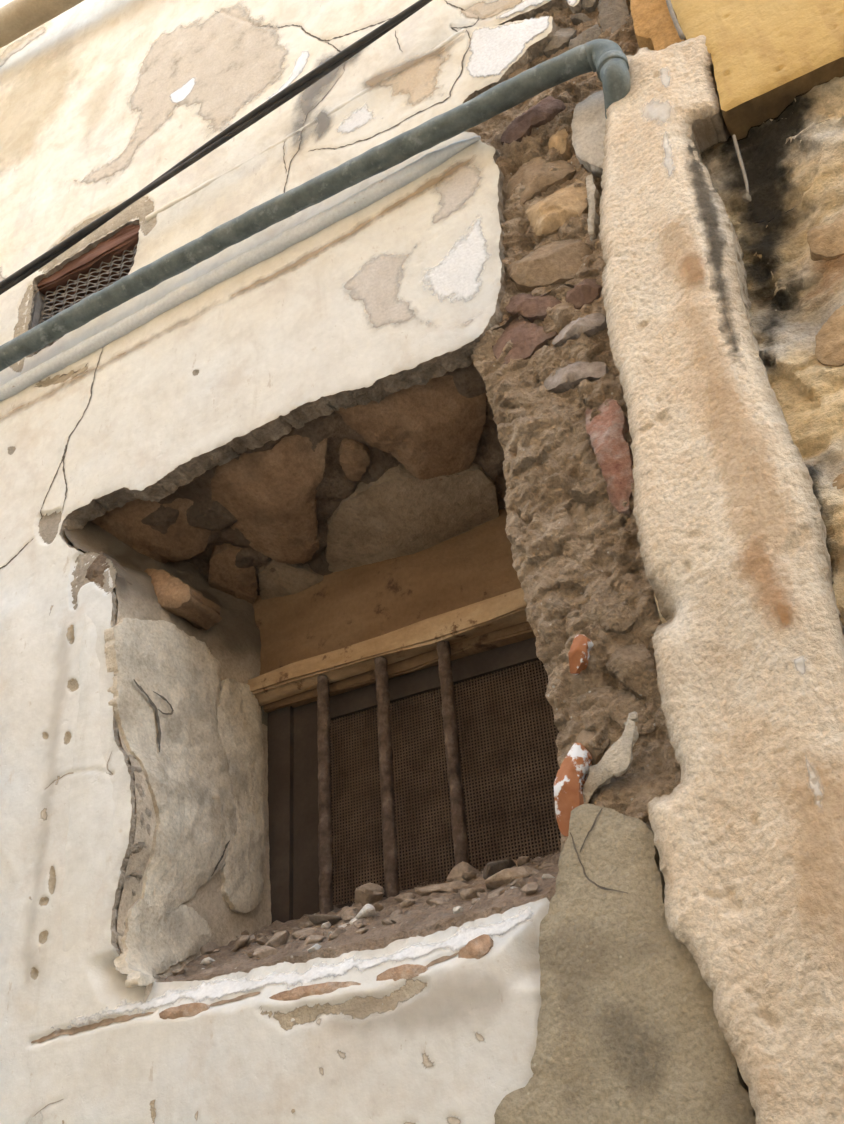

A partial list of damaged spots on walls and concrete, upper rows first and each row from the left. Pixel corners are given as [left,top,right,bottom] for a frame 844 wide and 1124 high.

spalling [461,0,641,80]
peeling [82,4,309,183]
crack [214,1,479,193]
water stain [688,92,815,352]
peeling [344,254,414,327]
crack [0,349,103,569]
spalling [424,71,681,827]
water stain [806,465,829,521]
spalling [70,552,117,610]
spalling [66,625,75,644]
spalling [29,866,56,906]
spalling [261,979,427,1030]